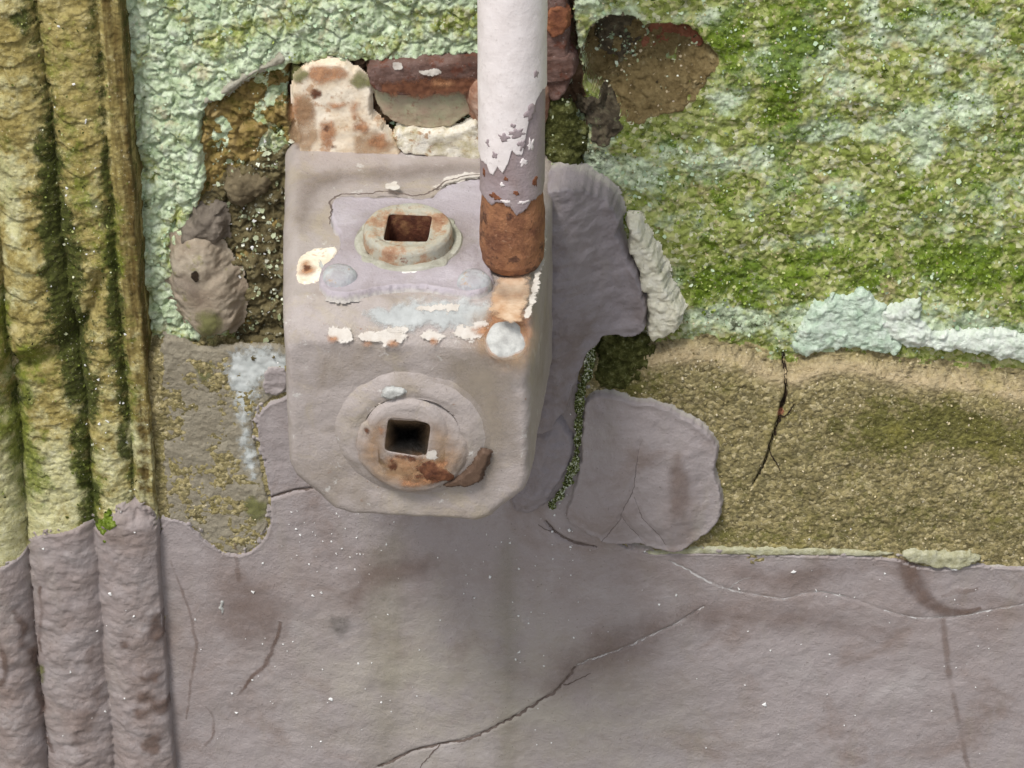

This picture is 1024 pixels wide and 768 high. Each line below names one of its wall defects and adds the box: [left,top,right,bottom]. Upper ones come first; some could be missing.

corrosion [287,57,476,154]
corrosion [561,0,587,125]
peeling [160,52,296,553]
peeling [296,246,337,284]
peeling [328,297,493,347]
corrosion [365,428,454,486]
crack [754,352,794,482]
crack [884,609,992,619]
crack [378,562,748,768]